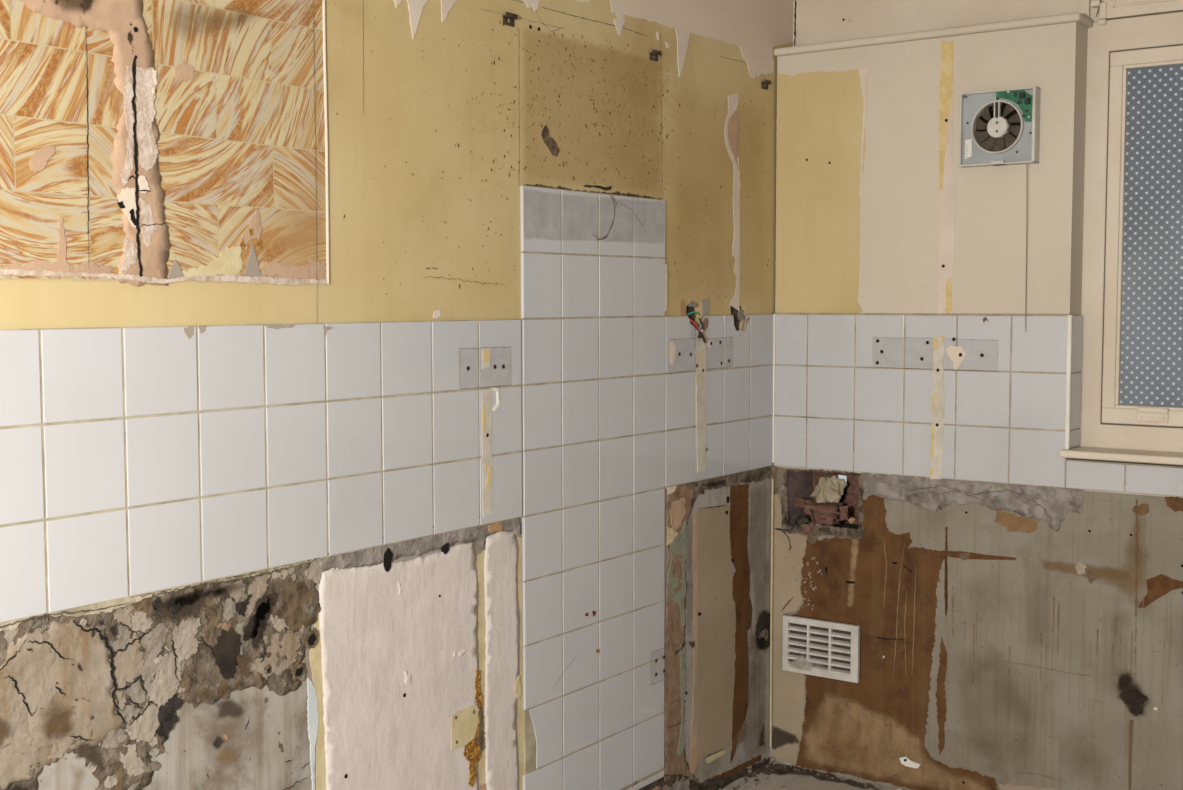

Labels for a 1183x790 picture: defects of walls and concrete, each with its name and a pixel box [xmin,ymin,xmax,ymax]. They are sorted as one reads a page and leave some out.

leakage [55,0,92,10]
peeling [117,65,159,273]
crack [117,55,169,277]
crack [0,638,73,717]
crack [73,620,215,727]
spalling [0,560,323,790]
leakage [159,584,234,619]
leakage [202,592,278,717]
flaking render [638,466,1057,790]